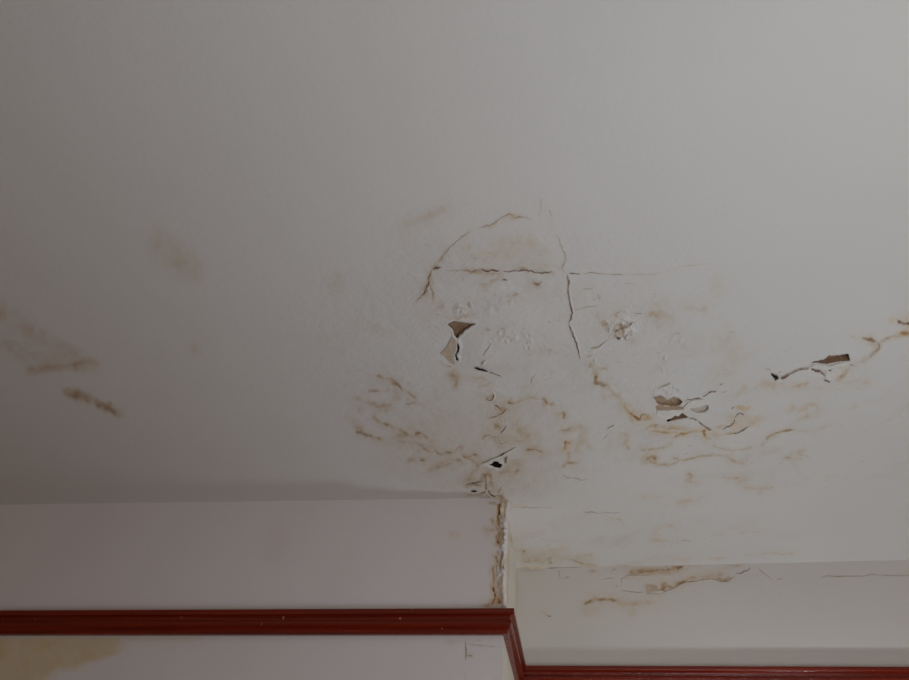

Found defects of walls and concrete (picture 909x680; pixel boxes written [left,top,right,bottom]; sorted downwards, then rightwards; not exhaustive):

crack [414,214,532,303]
crack [479,233,624,360]
spalling [434,312,479,369]
spalling [808,350,853,381]
spalling [650,392,711,424]
spalling [481,447,516,471]